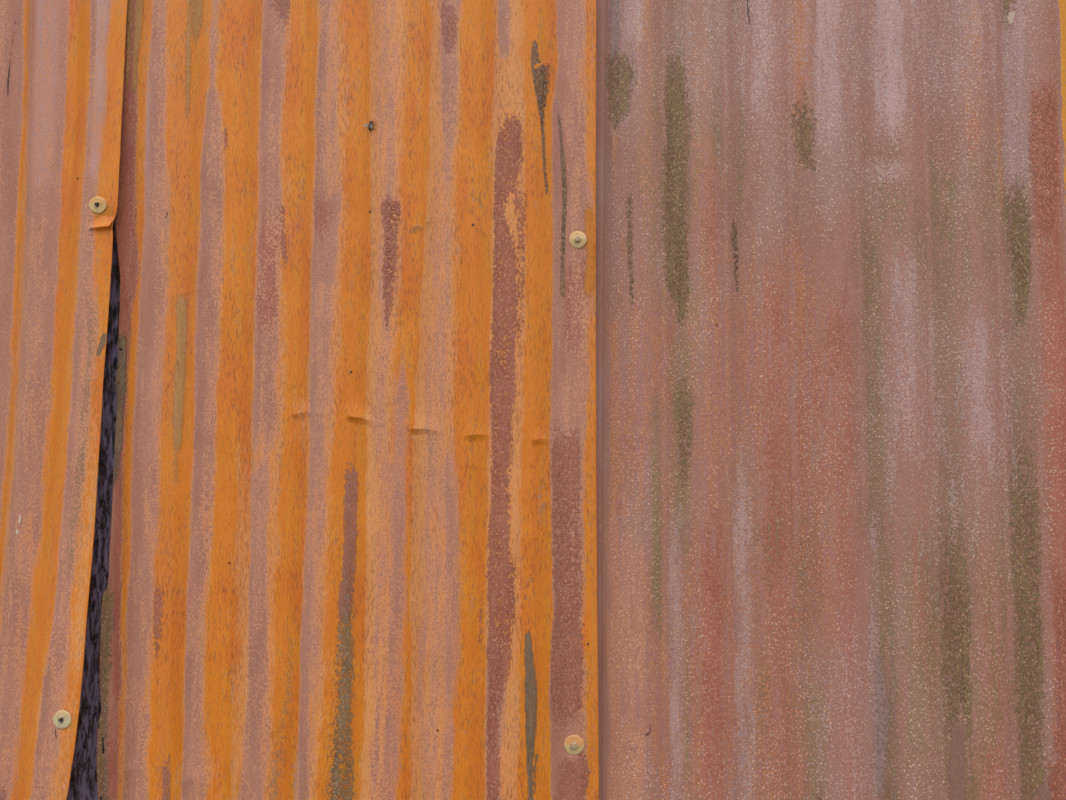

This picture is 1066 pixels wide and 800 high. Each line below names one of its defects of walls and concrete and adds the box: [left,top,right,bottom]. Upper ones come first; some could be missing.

rust [185,0,202,116]
rust [441,0,458,52]
rust [1028,81,1061,238]
rust [369,194,400,326]
rust [584,208,595,296]
rust [478,113,527,800]
rust [153,588,165,657]
rust [337,462,358,620]
rust [549,427,589,732]
rust [162,755,171,800]